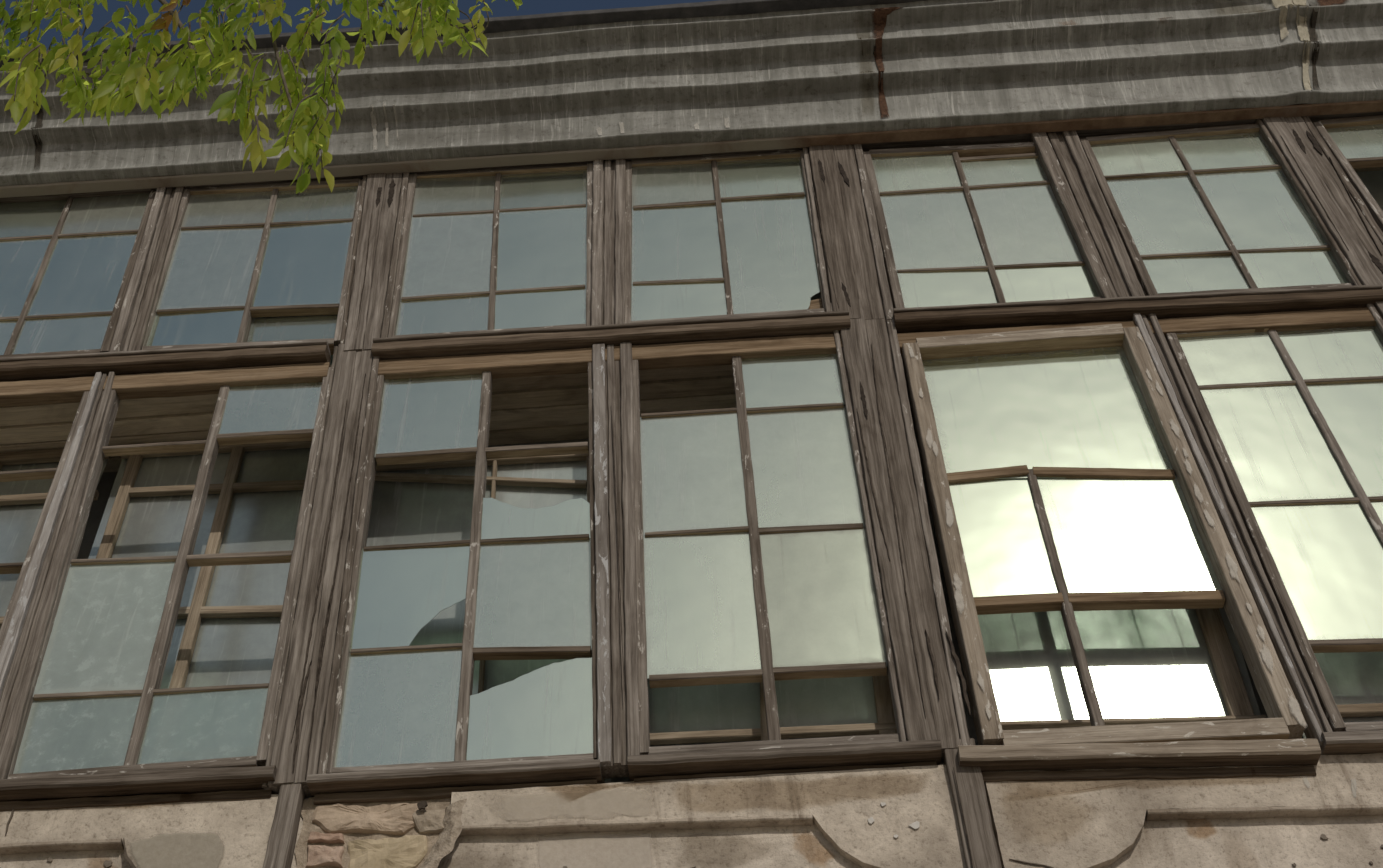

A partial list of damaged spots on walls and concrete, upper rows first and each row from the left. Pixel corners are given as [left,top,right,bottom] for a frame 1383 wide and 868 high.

corrosion [873,7,904,117]
water stain [1272,0,1312,90]
spalling [295,797,467,868]